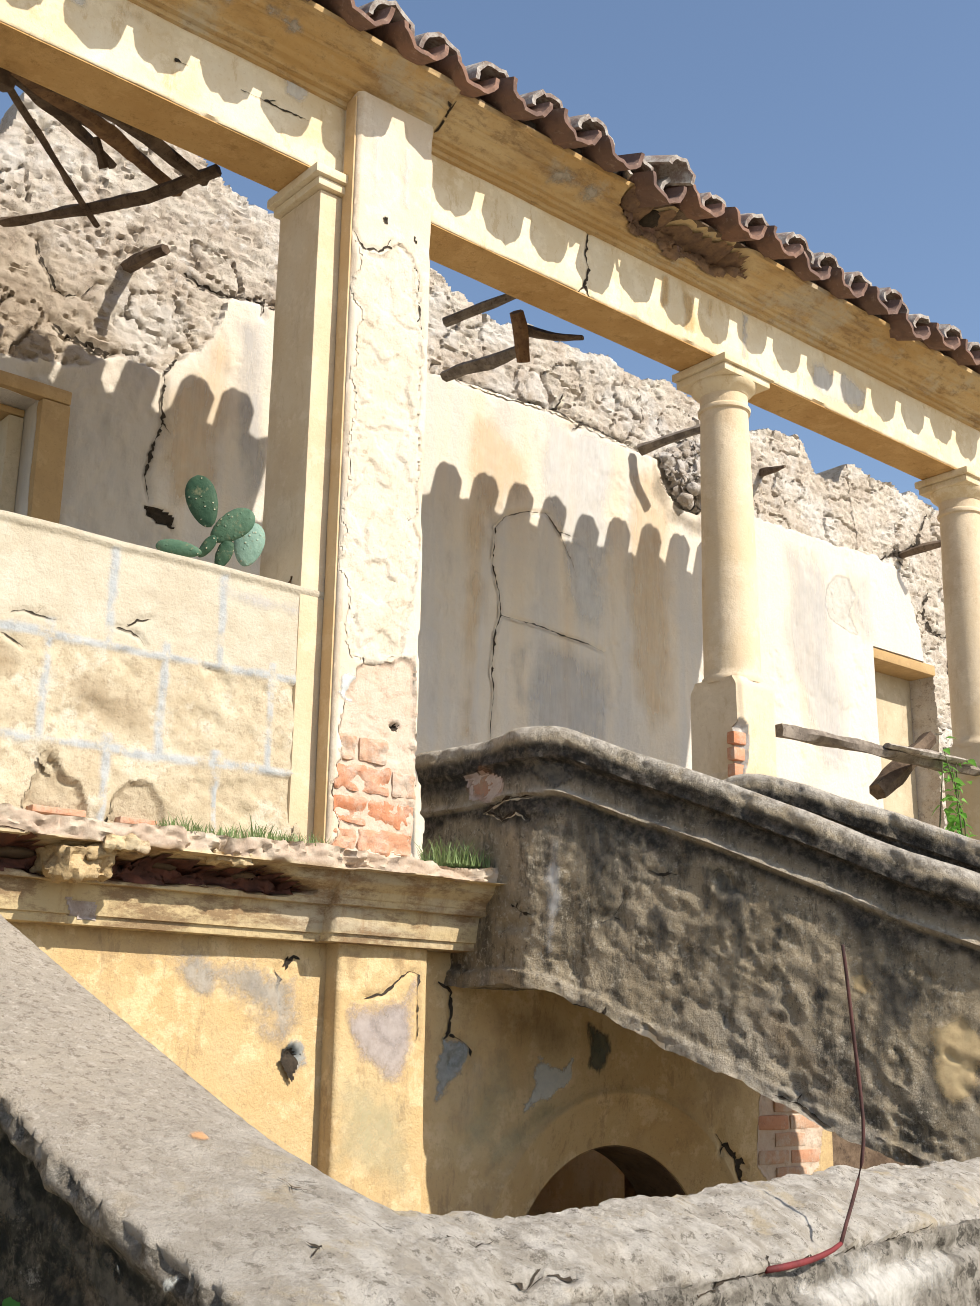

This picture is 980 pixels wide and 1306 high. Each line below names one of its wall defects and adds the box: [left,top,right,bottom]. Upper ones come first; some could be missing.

crack [354,231,423,337]
crack [578,234,591,297]
crack [144,359,177,525]
crack [455,379,639,452]
spalling [328,236,424,857]
flaking render [727,717,750,777]
water stain [678,853,753,1002]
peeling [182,957,306,1082]
water stain [588,1023,611,1073]
water stain [862,930,931,1049]
flaking render [757,1094,823,1181]
water stain [50,1213,143,1306]